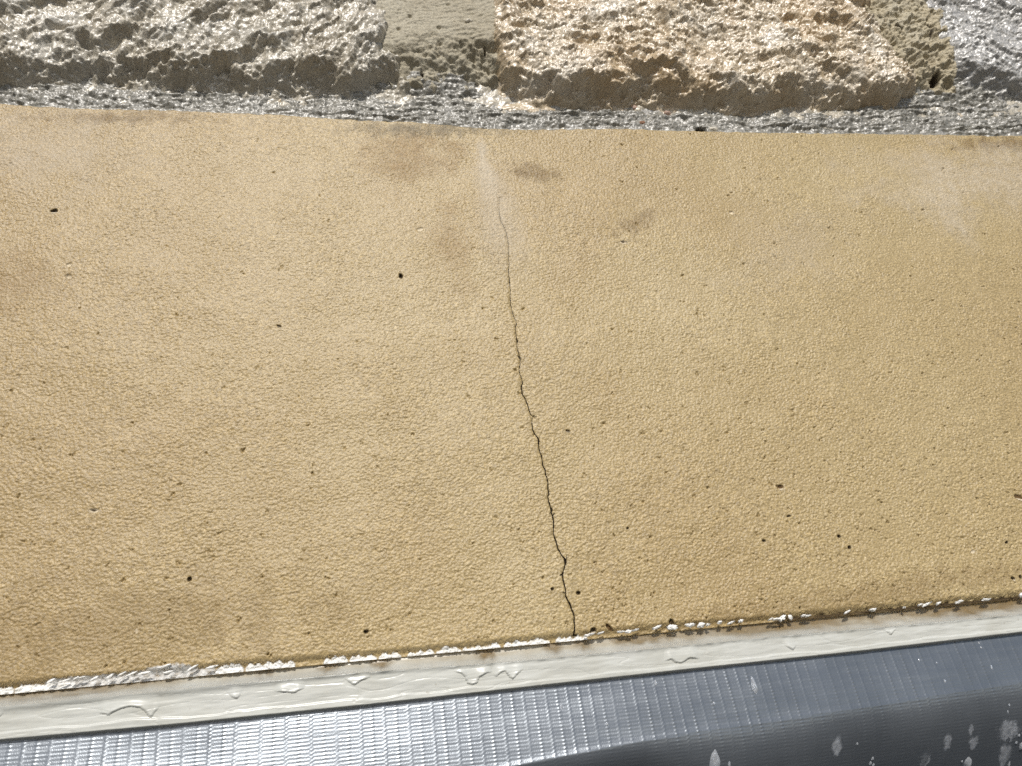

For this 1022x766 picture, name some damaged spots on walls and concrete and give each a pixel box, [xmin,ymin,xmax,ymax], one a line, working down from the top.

crack [499,198,577,636]